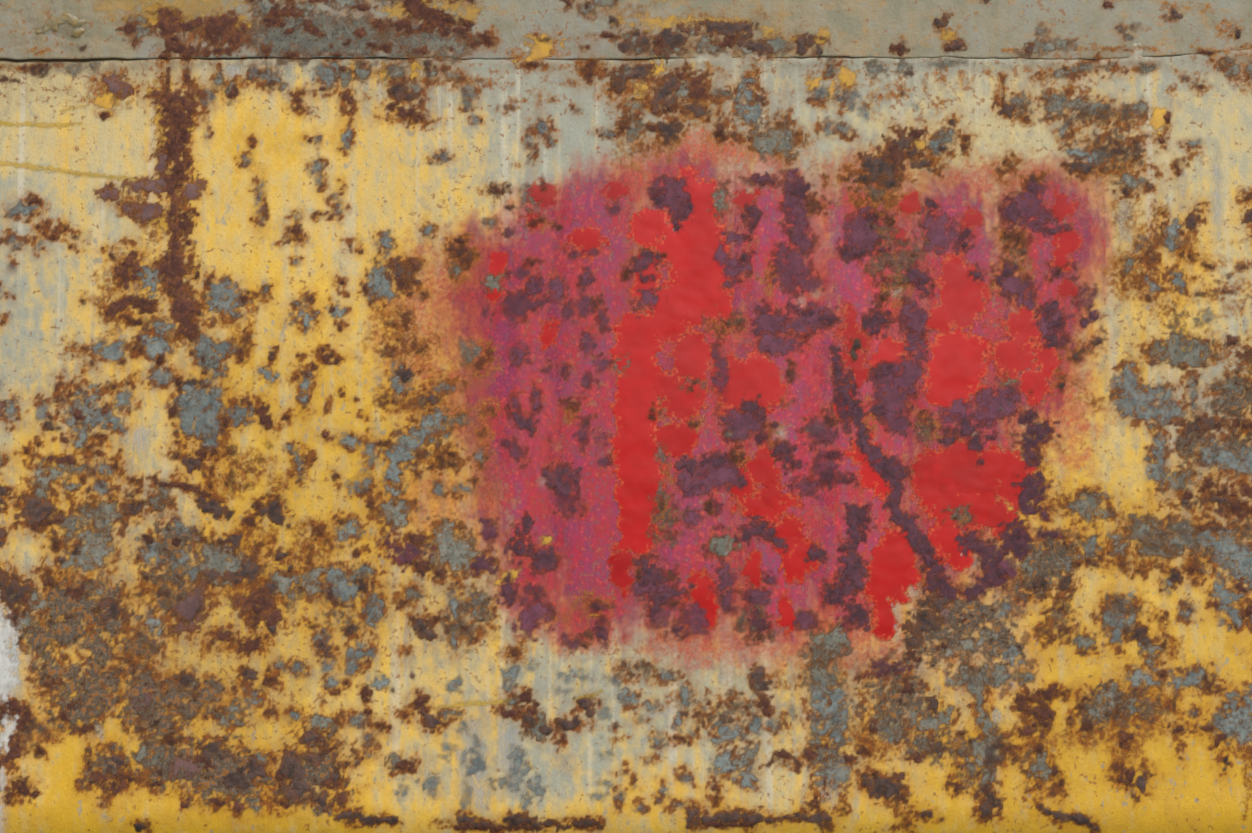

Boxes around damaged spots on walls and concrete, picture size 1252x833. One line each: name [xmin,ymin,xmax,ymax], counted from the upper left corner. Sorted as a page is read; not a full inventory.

corrosion [561,0,830,168]
peeling [0,191,81,269]
corrosion [66,0,499,345]
peeling [970,26,1252,497]
leakage [0,612,21,753]
corrosion [0,440,403,829]
peeling [0,230,541,769]
corrosion [370,498,502,657]
corrosion [370,686,602,753]
peeling [440,516,614,692]
peeling [593,168,1252,825]
corrosion [942,664,1079,824]